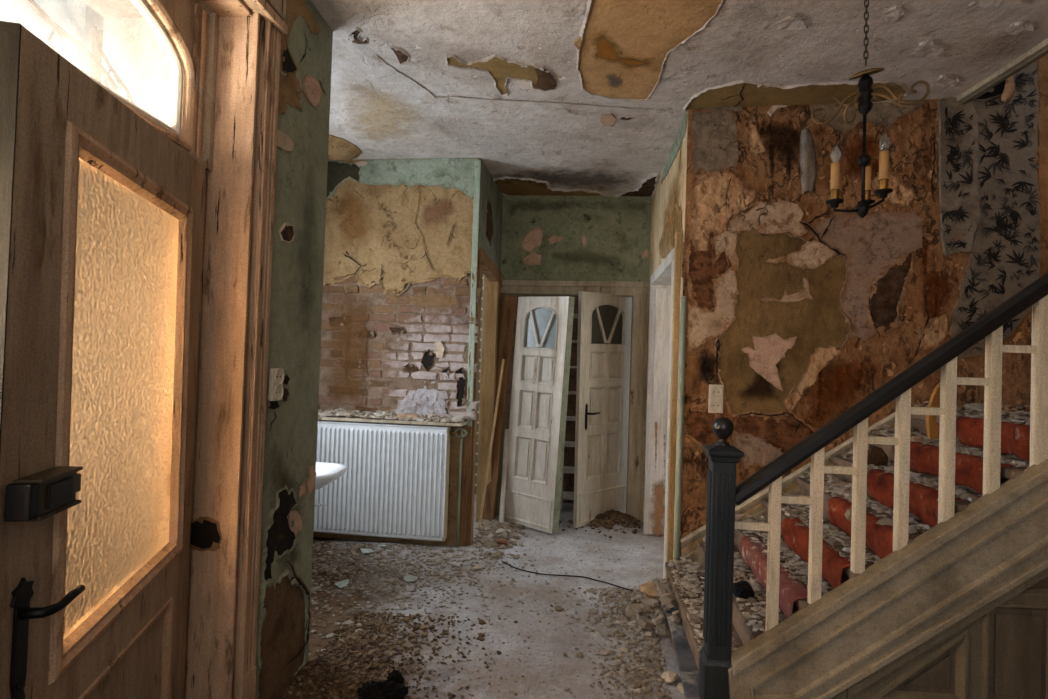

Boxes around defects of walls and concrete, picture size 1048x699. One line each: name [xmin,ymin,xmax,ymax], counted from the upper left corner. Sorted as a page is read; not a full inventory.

flaking render [278,0,322,115]
flaking render [445,54,559,96]
flaking render [574,0,725,101]
flaking render [493,80,910,197]
crack [334,251,410,295]
flaking render [318,270,482,421]
peeling [326,158,495,249]
crack [413,186,455,271]
flaking render [641,168,852,453]
flaking render [868,251,917,336]
peeling [871,172,918,210]
flaking render [255,466,317,699]